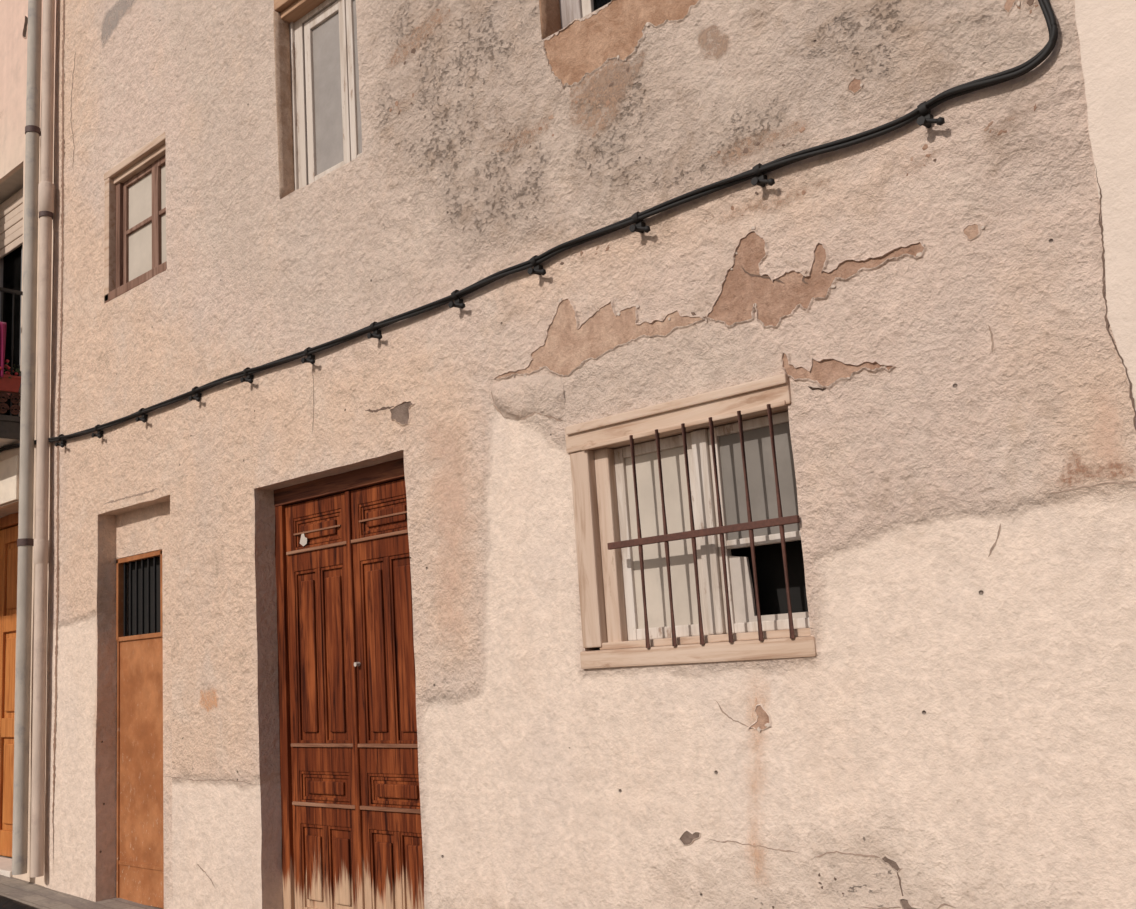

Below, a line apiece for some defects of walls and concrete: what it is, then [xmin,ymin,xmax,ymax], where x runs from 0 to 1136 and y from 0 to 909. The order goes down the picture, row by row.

spalling [543,0,702,103]
leakage [699,25,728,58]
peeling [494,226,927,381]
crack [1095,167,1136,430]
peeling [781,350,896,391]
spalling [365,399,415,427]
spalling [748,703,772,733]
crack [710,839,956,909]